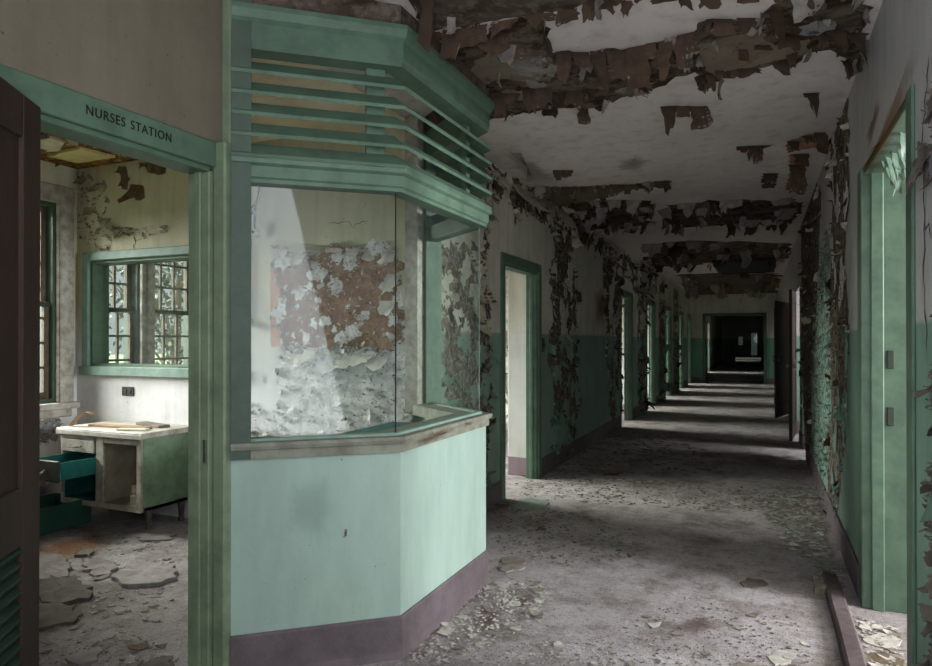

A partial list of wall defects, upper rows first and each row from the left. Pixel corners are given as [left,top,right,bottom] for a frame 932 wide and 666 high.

peeling [409,0,874,130]
peeling [40,132,168,252]
peeling [906,81,932,196]
peeling [251,239,414,437]
peeling [441,97,850,526]
peeling [40,417,64,445]
peeling [915,462,932,666]